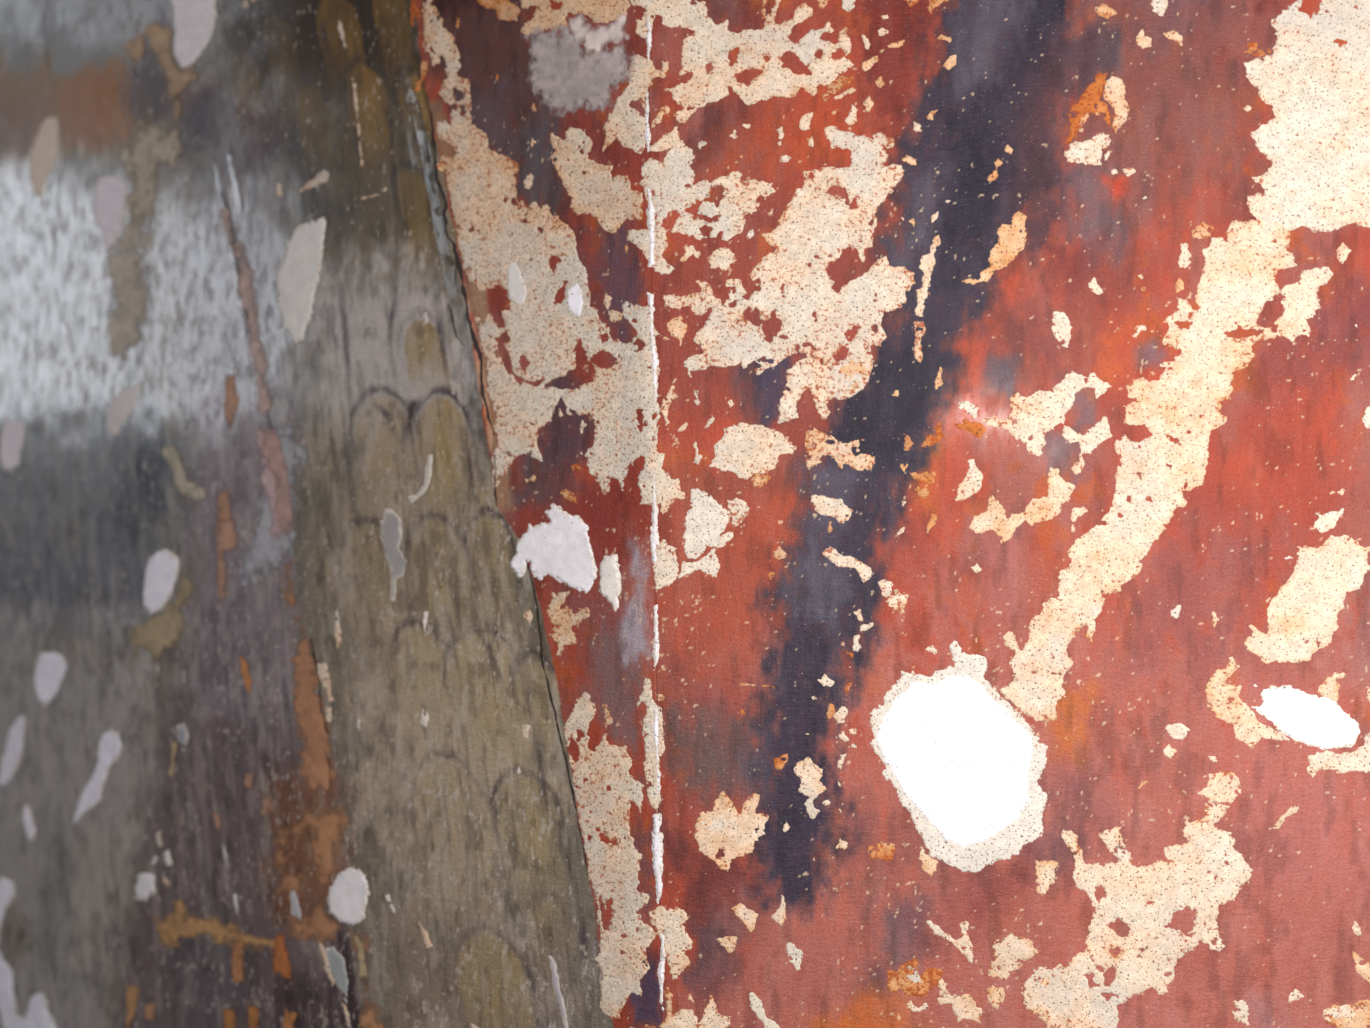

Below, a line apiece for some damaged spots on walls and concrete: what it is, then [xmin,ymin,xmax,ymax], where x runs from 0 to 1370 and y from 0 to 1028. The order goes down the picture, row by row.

damp [107,23,197,359]
corrosion [216,491,237,601]
corrosion [220,209,292,532]
crack [417,95,497,506]
peeling [410,0,951,1028]
peeling [900,0,1370,722]
corrosion [126,985,155,1028]
corrosion [153,565,383,1028]
crack [526,560,589,876]
peeling [886,756,1253,1028]
peeling [1163,723,1190,758]
peeling [1323,921,1370,1028]